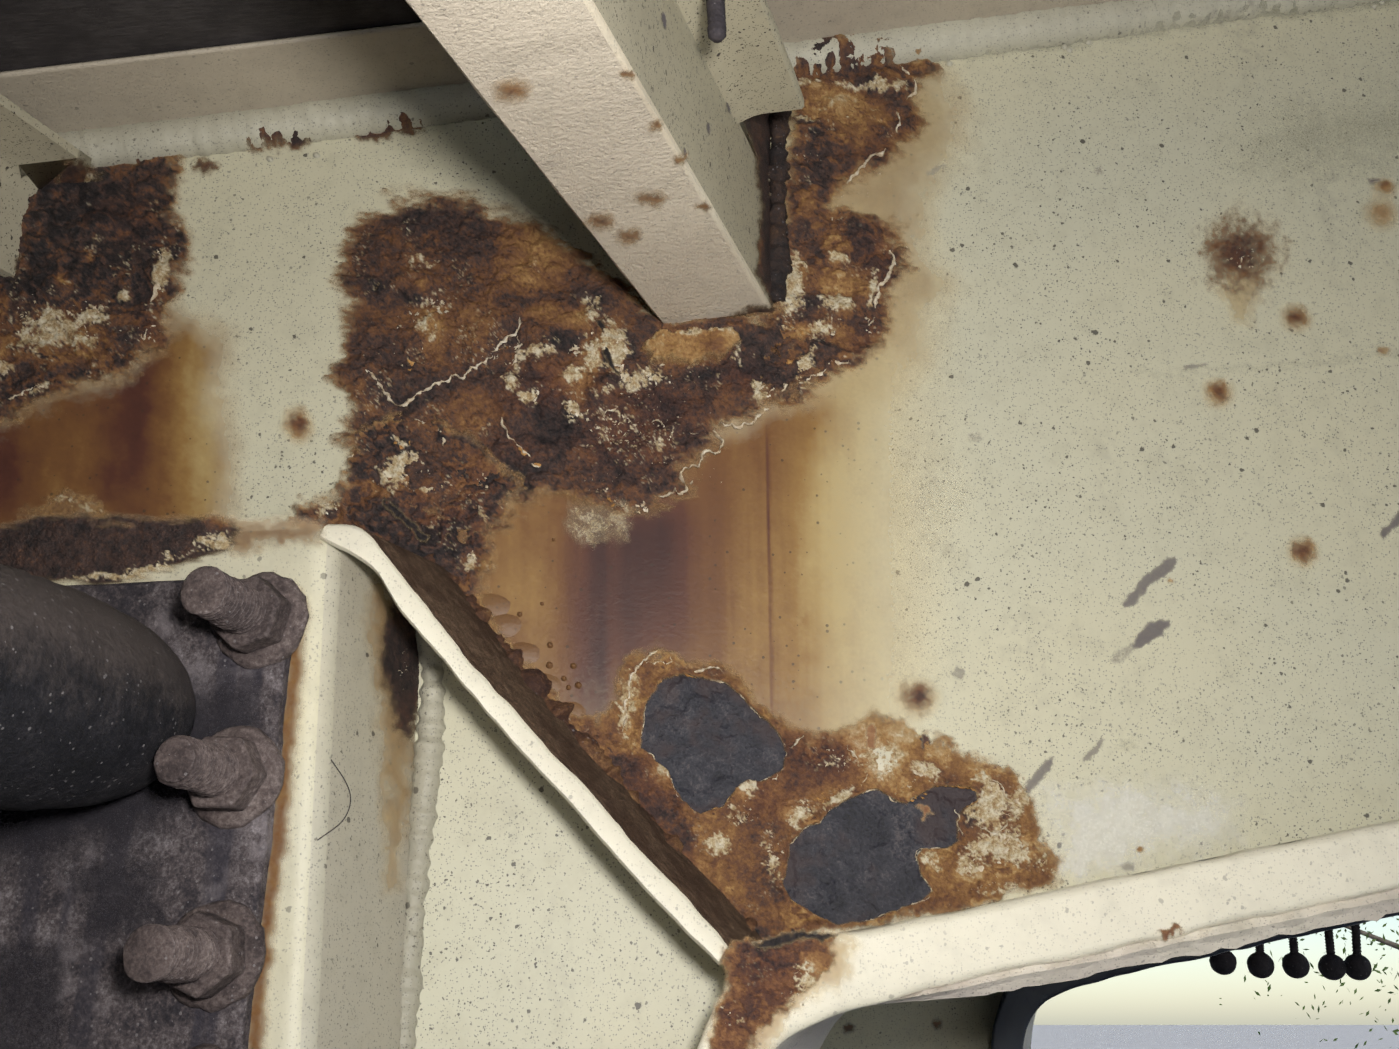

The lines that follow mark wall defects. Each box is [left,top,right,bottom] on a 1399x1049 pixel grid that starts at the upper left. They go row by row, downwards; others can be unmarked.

rust [1199,216,1278,315]
rust [1287,308,1307,326]
rust [1207,382,1227,402]
rust [0,34,1061,1049]
rust [1291,539,1315,563]
peeling [640,674,787,814]
peeling [782,785,978,925]